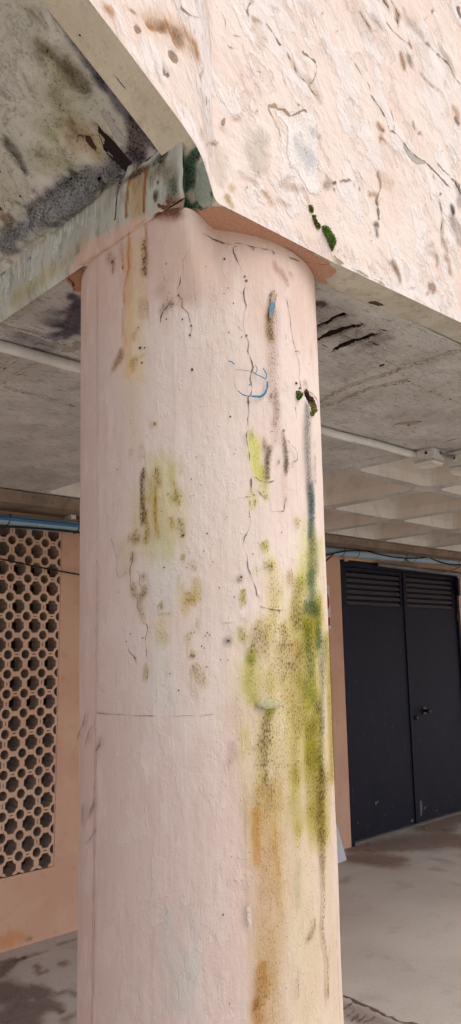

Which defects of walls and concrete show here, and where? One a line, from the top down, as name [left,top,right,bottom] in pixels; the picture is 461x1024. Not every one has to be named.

crack [252,23,320,106]
crack [360,0,460,90]
peeling [256,103,321,196]
crack [352,59,458,229]
leakage [0,108,175,304]
crack [289,172,382,241]
crack [160,233,385,420]
leakage [266,418,290,479]
crack [243,477,286,613]